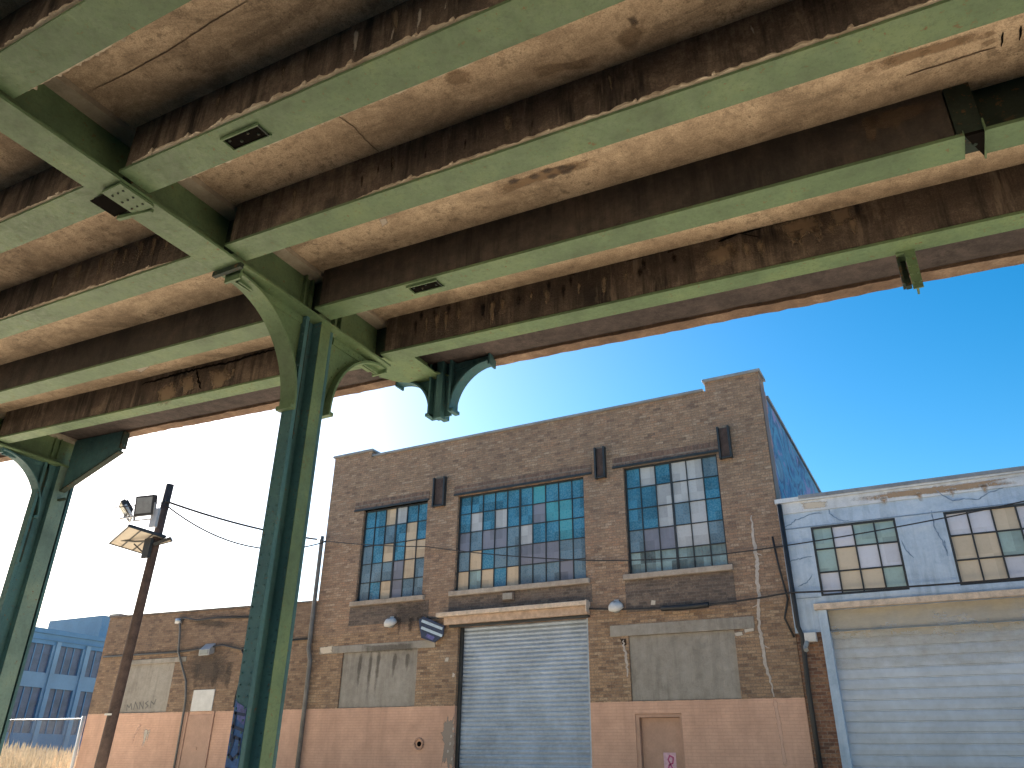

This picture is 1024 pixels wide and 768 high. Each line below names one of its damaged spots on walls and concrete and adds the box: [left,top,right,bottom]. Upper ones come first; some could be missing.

crack [96,1,248,89]
crack [906,47,996,76]
crack [339,117,379,152]
crack [785,510,848,527]
crack [931,488,1003,556]
crack [750,515,786,765]